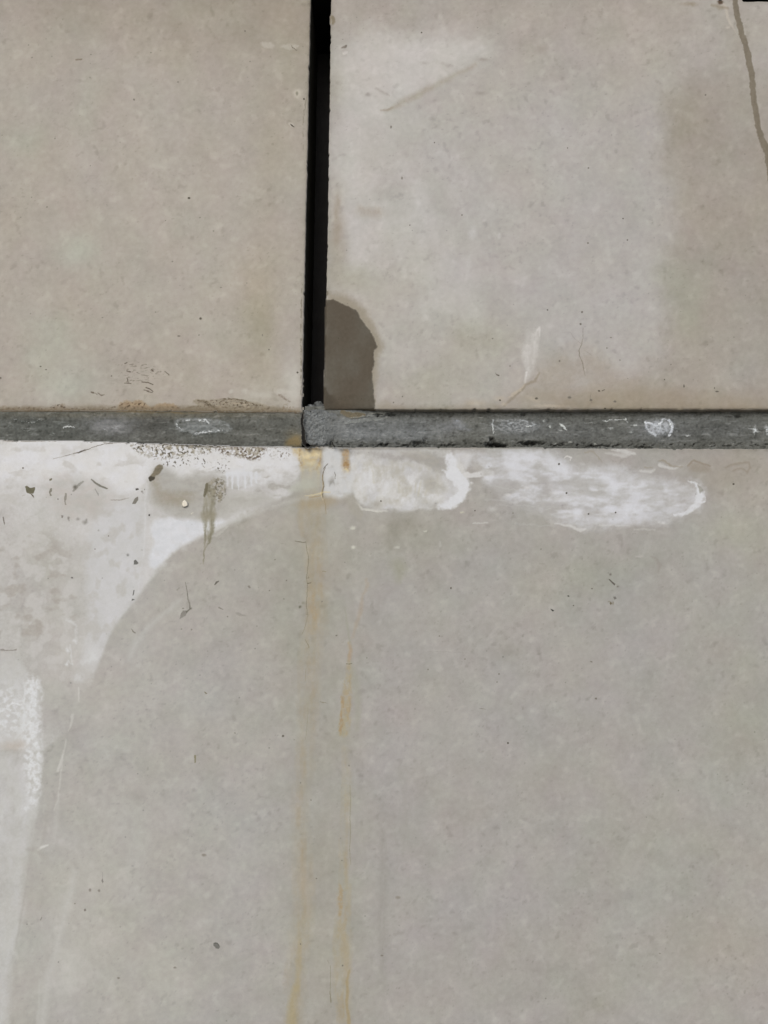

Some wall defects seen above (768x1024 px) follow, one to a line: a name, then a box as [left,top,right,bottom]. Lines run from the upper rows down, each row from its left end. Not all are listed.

rust [282,433,323,493]
rust [341,449,352,470]
damp [0,326,768,1024]